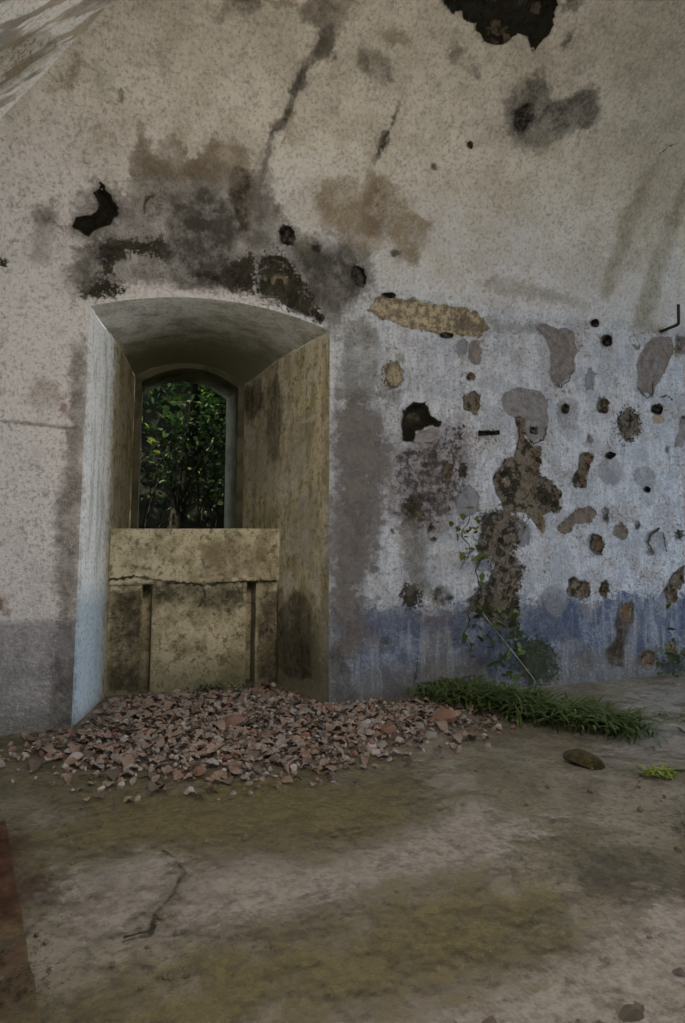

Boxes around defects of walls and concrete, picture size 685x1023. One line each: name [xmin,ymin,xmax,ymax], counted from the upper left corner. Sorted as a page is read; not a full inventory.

leakage [0,37,56,87]
spalling [444,0,558,51]
leakage [507,73,600,144]
spalling [72,182,122,241]
leakage [72,161,431,324]
spalling [367,292,490,415]
peeling [538,323,675,447]
spalling [391,387,685,633]
leakage [399,580,454,611]
crack [123,850,187,939]